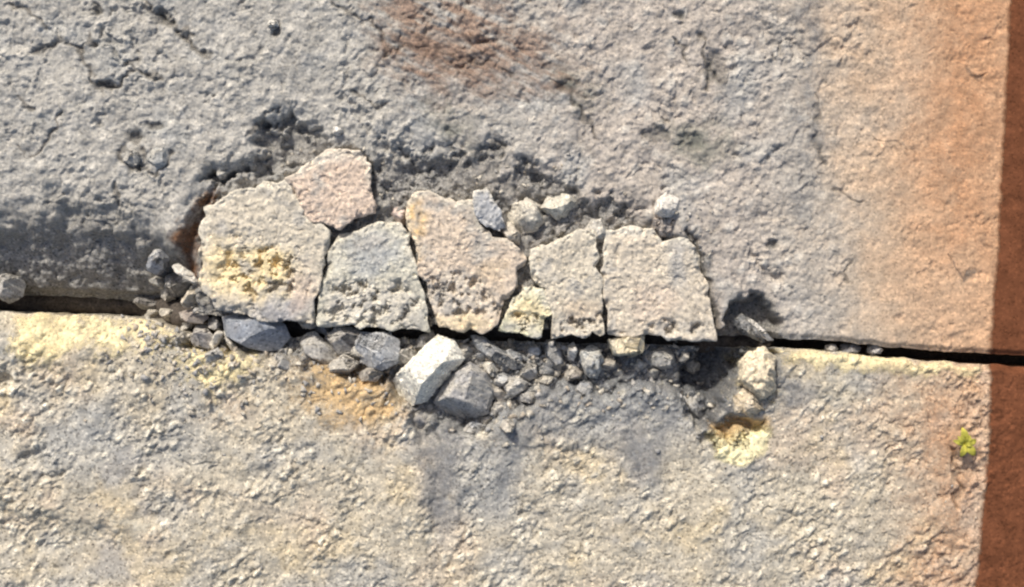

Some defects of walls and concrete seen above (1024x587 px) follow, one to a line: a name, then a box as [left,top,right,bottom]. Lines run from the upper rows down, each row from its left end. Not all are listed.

spalling [0,216,181,301]
spalling [177,124,783,406]
spalling [412,381,467,427]